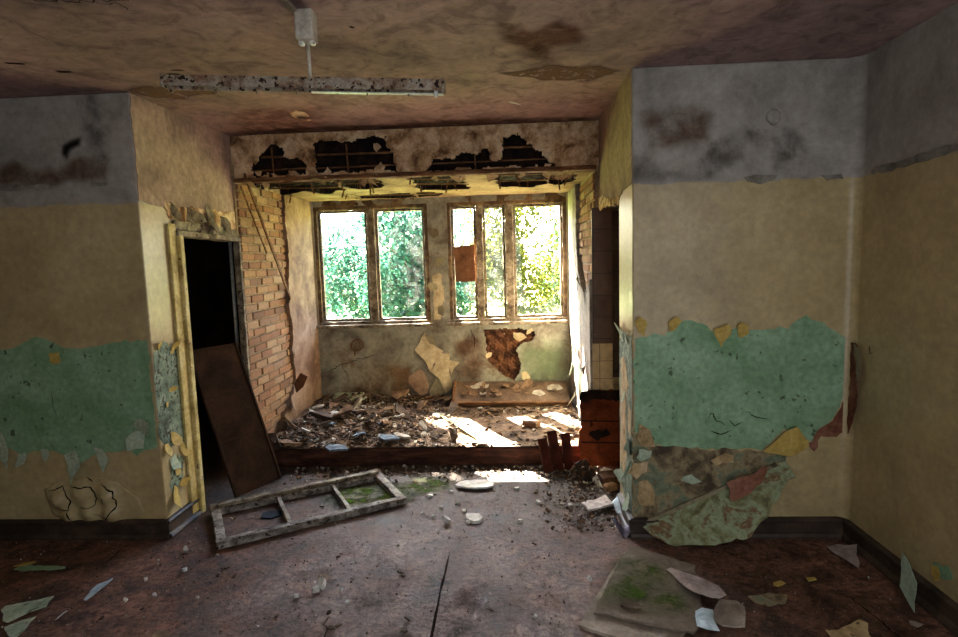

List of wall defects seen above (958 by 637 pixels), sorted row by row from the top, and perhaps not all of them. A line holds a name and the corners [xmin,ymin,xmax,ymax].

crack [34,0,136,11]
damp [505,22,579,57]
spalling [164,130,619,433]